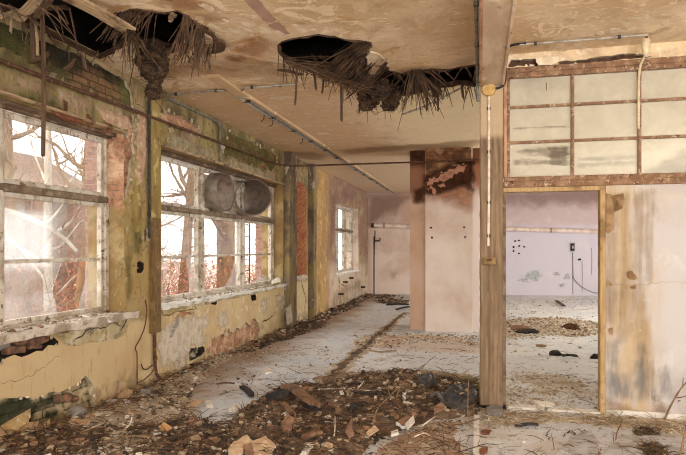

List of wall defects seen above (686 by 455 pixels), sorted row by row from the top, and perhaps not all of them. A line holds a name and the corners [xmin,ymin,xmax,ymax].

leakage [0,22,121,83]
flaking render [508,52,537,67]
flaking render [559,52,649,64]
flaking render [14,50,140,211]
flaking render [426,147,471,195]
spalling [0,334,57,365]
crack [2,274,142,384]
flaking render [189,319,259,358]
flaking render [0,378,97,425]